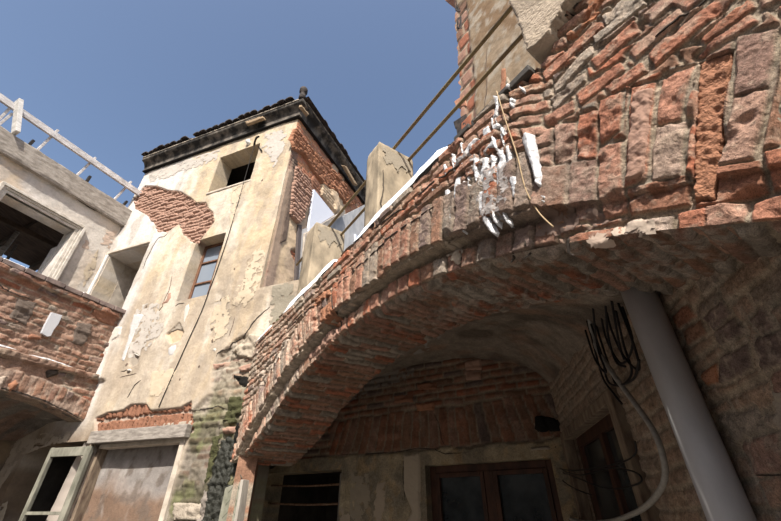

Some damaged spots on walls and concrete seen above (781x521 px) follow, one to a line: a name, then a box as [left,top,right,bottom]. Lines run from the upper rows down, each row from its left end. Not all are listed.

peeling [288,128,358,224]
leakage [432,83,656,237]
peeling [133,186,214,245]
crack [330,165,460,331]
peeling [166,304,190,355]
crack [216,309,267,356]
peeling [96,403,194,431]